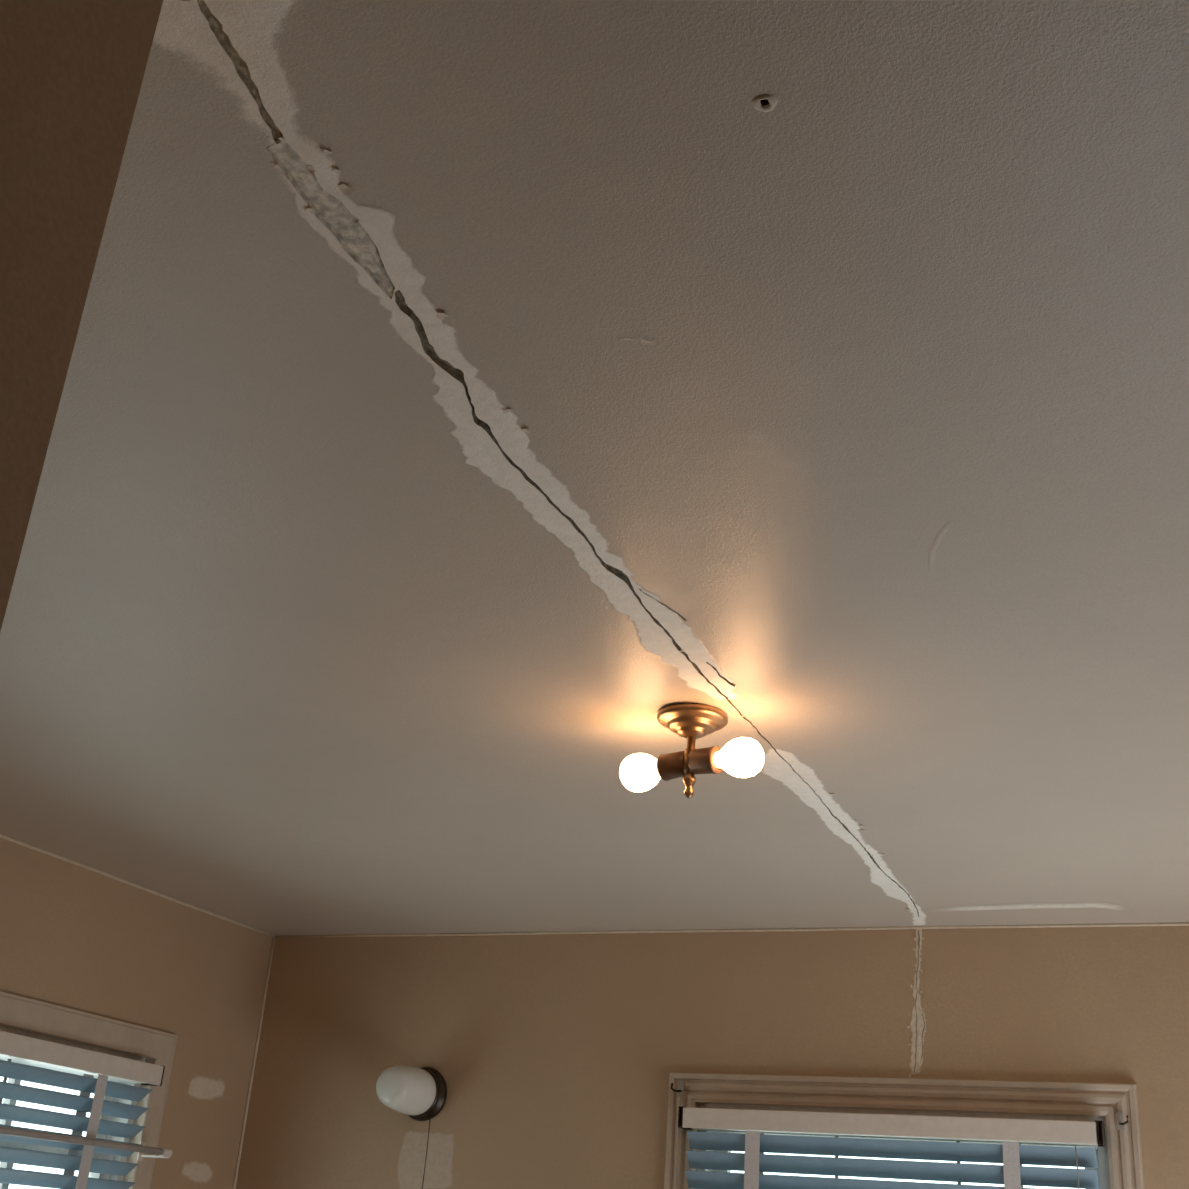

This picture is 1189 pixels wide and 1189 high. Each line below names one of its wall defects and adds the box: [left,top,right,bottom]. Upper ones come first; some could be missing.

peeling [148,0,739,701]
crack [197,0,928,1078]
spalling [751,94,778,112]